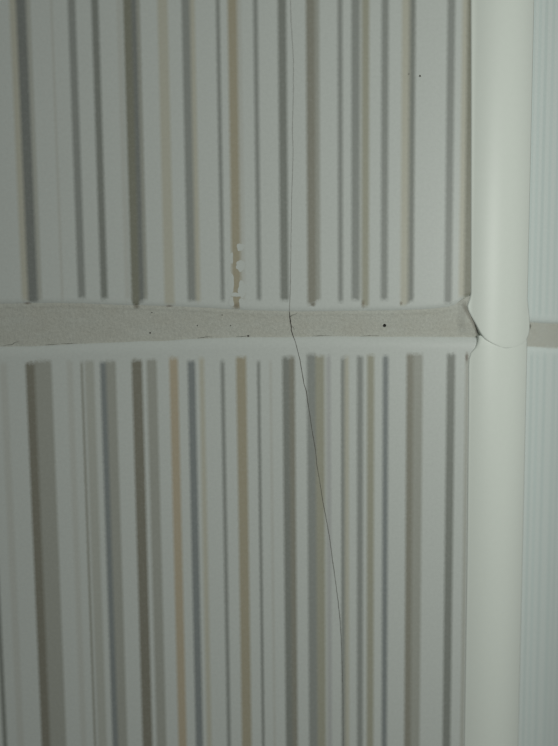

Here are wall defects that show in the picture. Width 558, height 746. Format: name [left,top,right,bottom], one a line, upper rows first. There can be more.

crack [289,259,342,651]